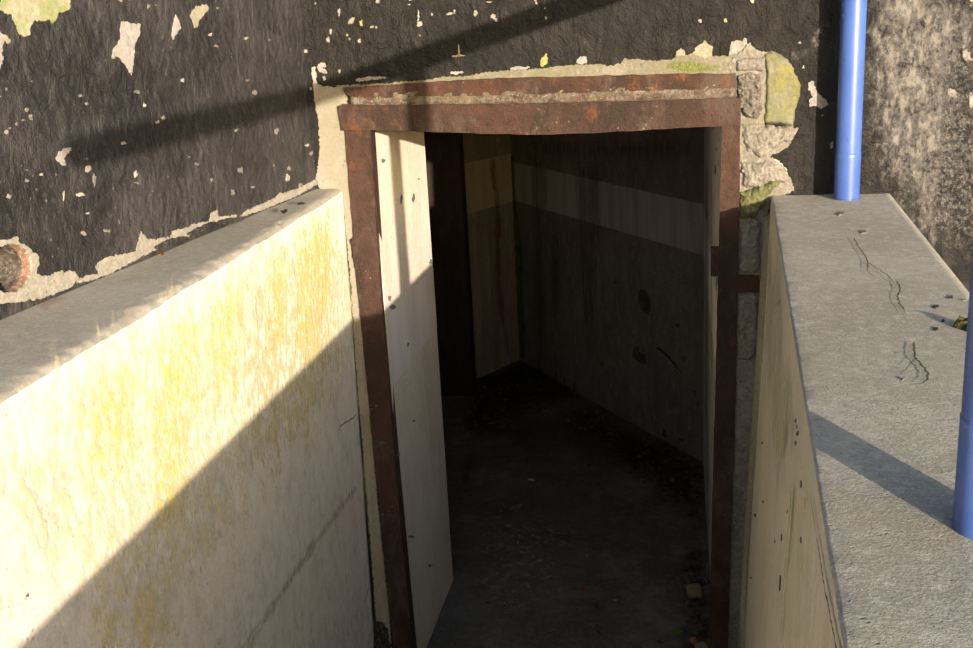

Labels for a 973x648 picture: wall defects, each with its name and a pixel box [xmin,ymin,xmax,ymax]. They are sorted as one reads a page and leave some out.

peeling [0,0,71,68]
peeling [112,21,141,75]
peeling [172,4,219,39]
corrosion [350,237,362,289]
crack [854,238,905,311]
spalling [0,38,798,648]
crack [900,342,929,385]
damp [3,219,353,648]
crack [810,495,837,648]